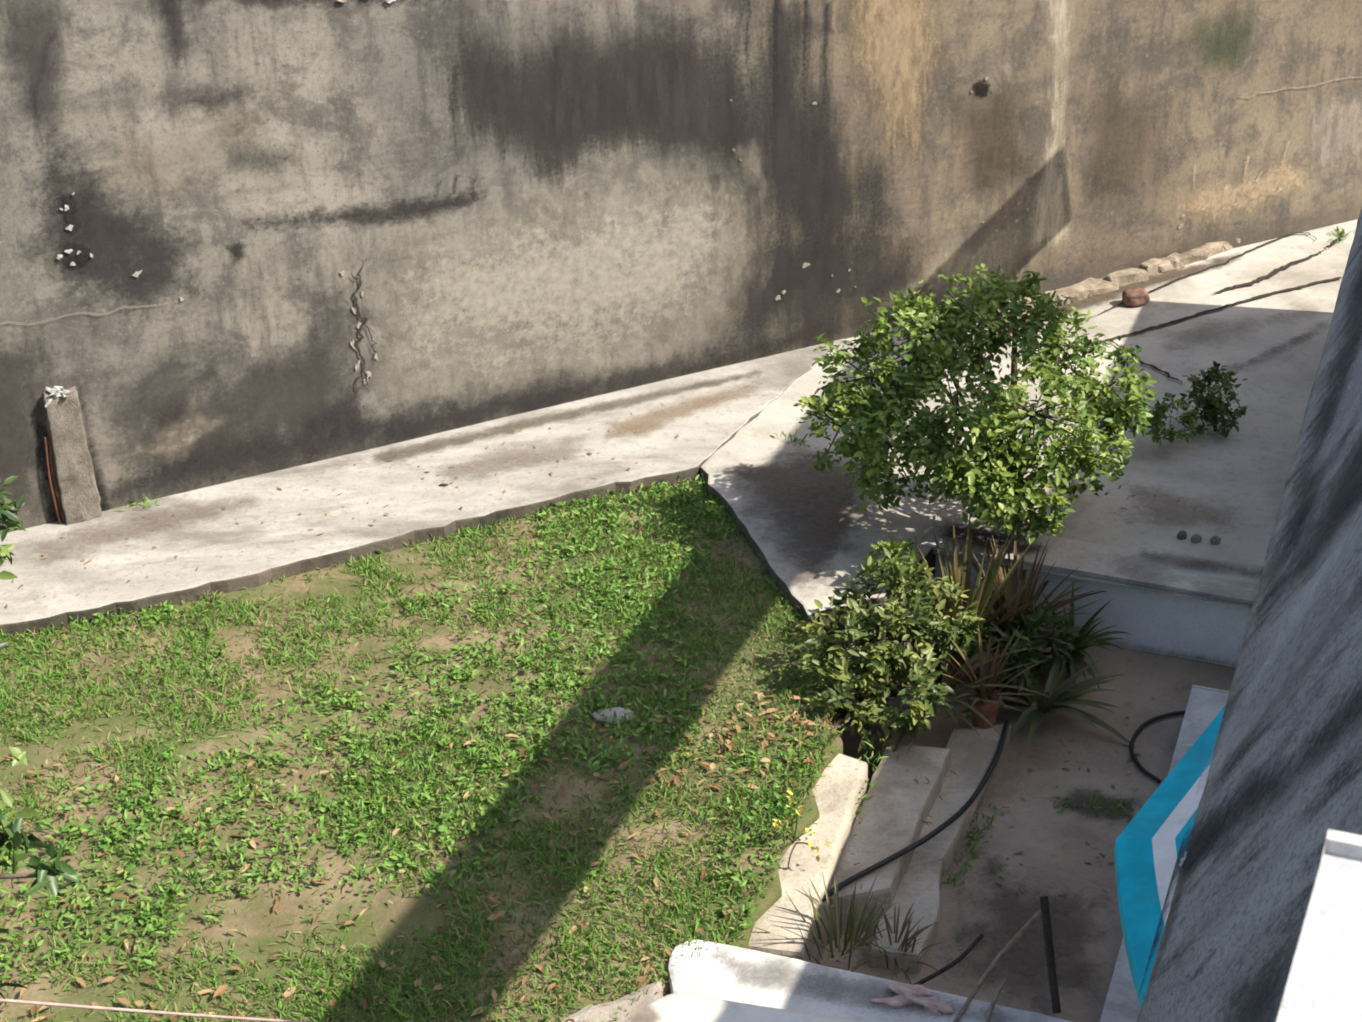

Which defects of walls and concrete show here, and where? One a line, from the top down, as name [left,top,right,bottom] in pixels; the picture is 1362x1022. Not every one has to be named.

spalling [970,77,993,96]
spalling [56,192,93,267]
crack [339,258,378,395]
water stain [114,0,1074,498]
crack [1091,232,1343,384]
corrosion [44,436,65,525]